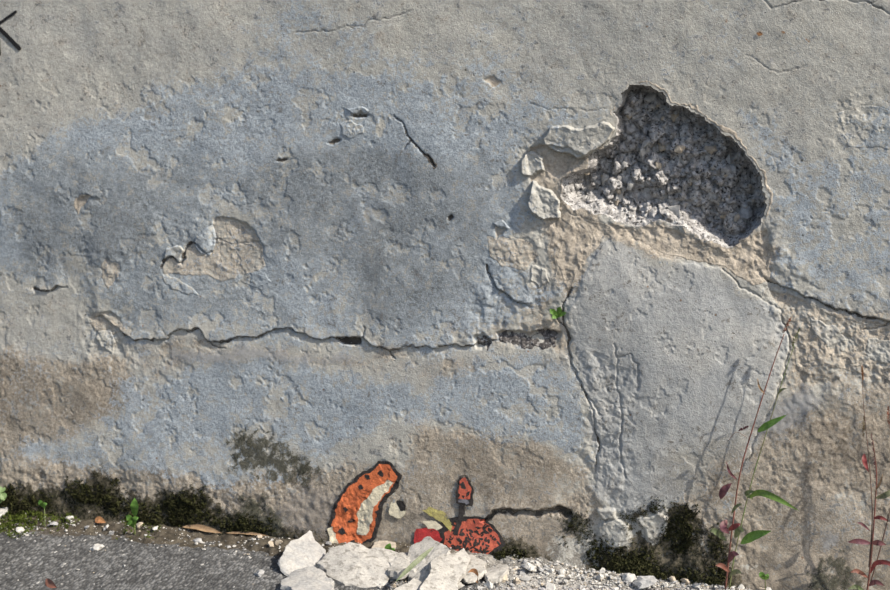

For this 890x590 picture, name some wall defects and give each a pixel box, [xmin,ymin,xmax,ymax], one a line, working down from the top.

crack [397,118,437,170]
spalling [162,217,271,295]
spalling [487,220,549,289]
spalling [521,80,890,381]
crack [123,327,494,357]
spalling [477,328,558,351]
crack [803,295,887,329]
water stain [226,428,322,489]
water stain [0,464,329,543]
crack [483,505,573,521]
water stain [496,537,553,562]
water stain [586,502,742,587]